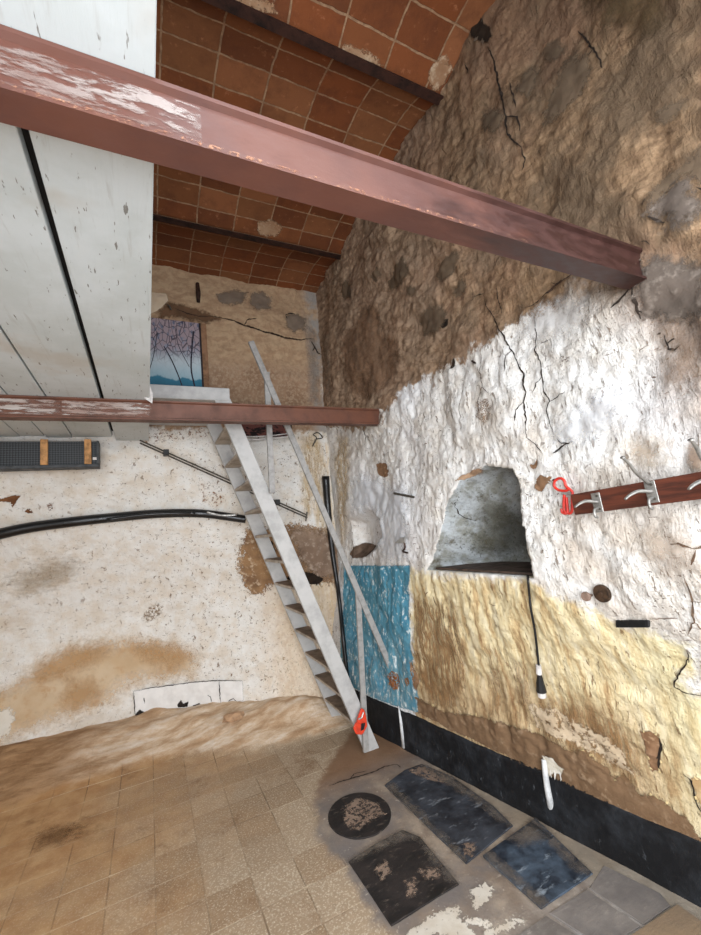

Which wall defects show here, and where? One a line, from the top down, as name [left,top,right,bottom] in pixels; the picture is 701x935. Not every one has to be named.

crack [487,46,526,169]
crack [175,308,322,355]
crack [446,355,488,418]
crack [472,275,571,453]
damp [0,641,192,737]
peeling [404,662,701,842]